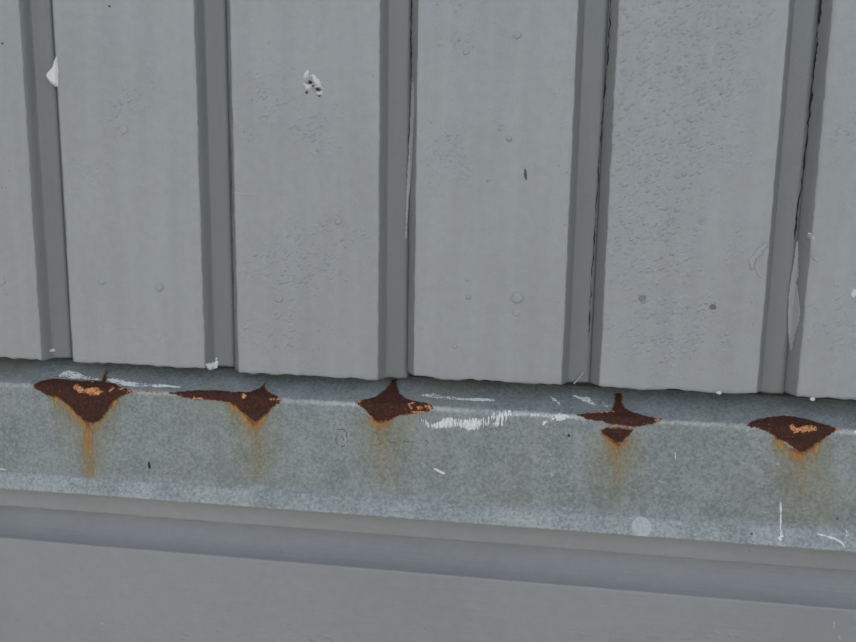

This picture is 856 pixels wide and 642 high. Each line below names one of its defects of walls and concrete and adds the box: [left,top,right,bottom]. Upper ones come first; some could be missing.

peeling [303,70,324,97]
corrosion [30,370,280,470]
corrosion [355,379,434,430]
corrosion [577,393,662,467]
corrosion [746,415,840,463]